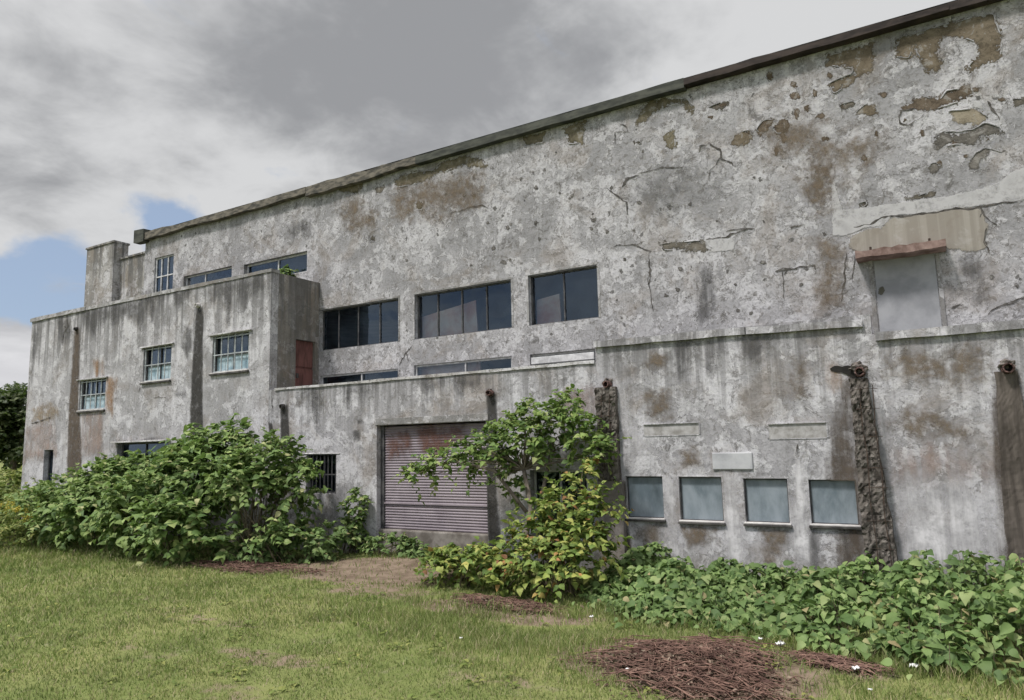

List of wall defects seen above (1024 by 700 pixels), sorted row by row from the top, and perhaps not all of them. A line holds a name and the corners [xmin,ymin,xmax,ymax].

spalling [635,97,695,126]
spalling [891,11,1006,175]
crack [607,142,733,214]
crack [616,242,653,309]
spalling [658,239,712,253]
crack [775,265,816,298]
leakage [30,282,190,484]
leakage [185,308,203,435]
leakage [665,474,743,565]
leakage [764,460,816,562]
leakage [831,378,864,566]
leakage [900,400,1008,572]